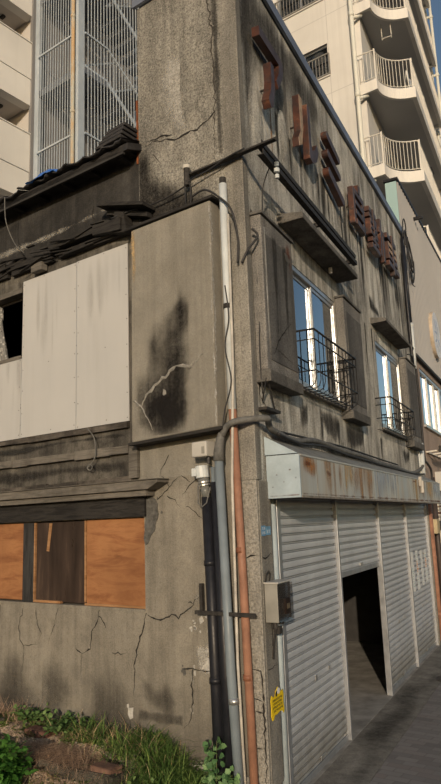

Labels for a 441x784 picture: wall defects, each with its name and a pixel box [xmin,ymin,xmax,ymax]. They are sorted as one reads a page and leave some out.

crack [145,0,217,161]
crack [133,354,203,430]
crack [158,455,200,517]
corrosion [304,457,315,473]
crack [18,610,58,669]
crack [76,612,106,674]
crack [113,595,199,694]
crack [184,668,210,728]